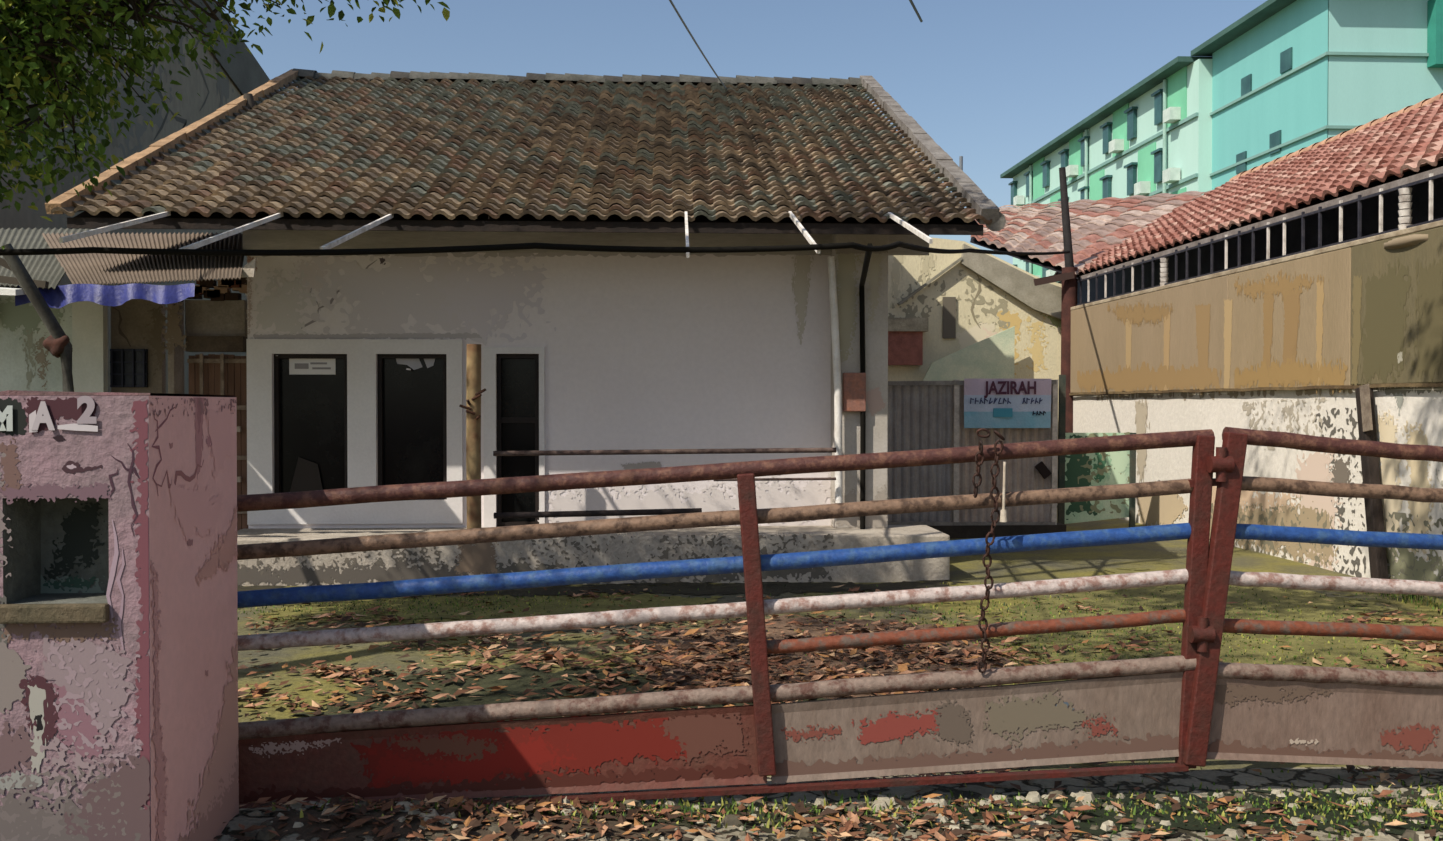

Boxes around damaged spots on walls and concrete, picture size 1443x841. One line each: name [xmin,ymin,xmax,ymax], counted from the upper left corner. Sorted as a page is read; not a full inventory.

peeling [956,322,998,350]
crack [109,407,204,536]
peeling [0,632,142,799]